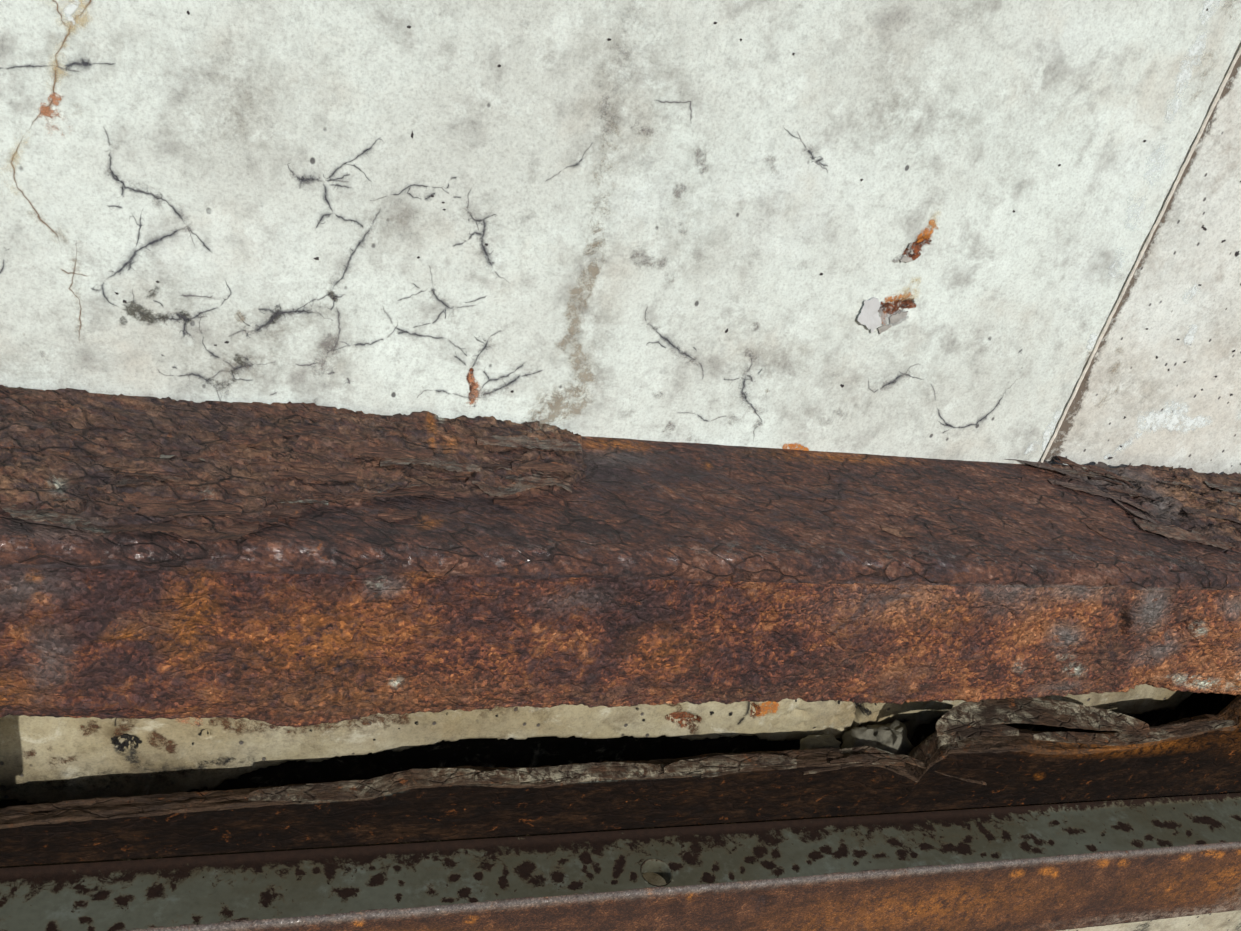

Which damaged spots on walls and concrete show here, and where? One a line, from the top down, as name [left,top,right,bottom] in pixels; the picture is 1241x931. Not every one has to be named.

rust [40,93,62,127]
spalling [892,219,938,263]
crack [11,130,542,406]
spalling [857,279,917,334]
rust [783,443,809,451]
rust [176,714,409,733]
rust [665,704,702,734]
rust [750,701,779,717]
rust [148,731,177,753]